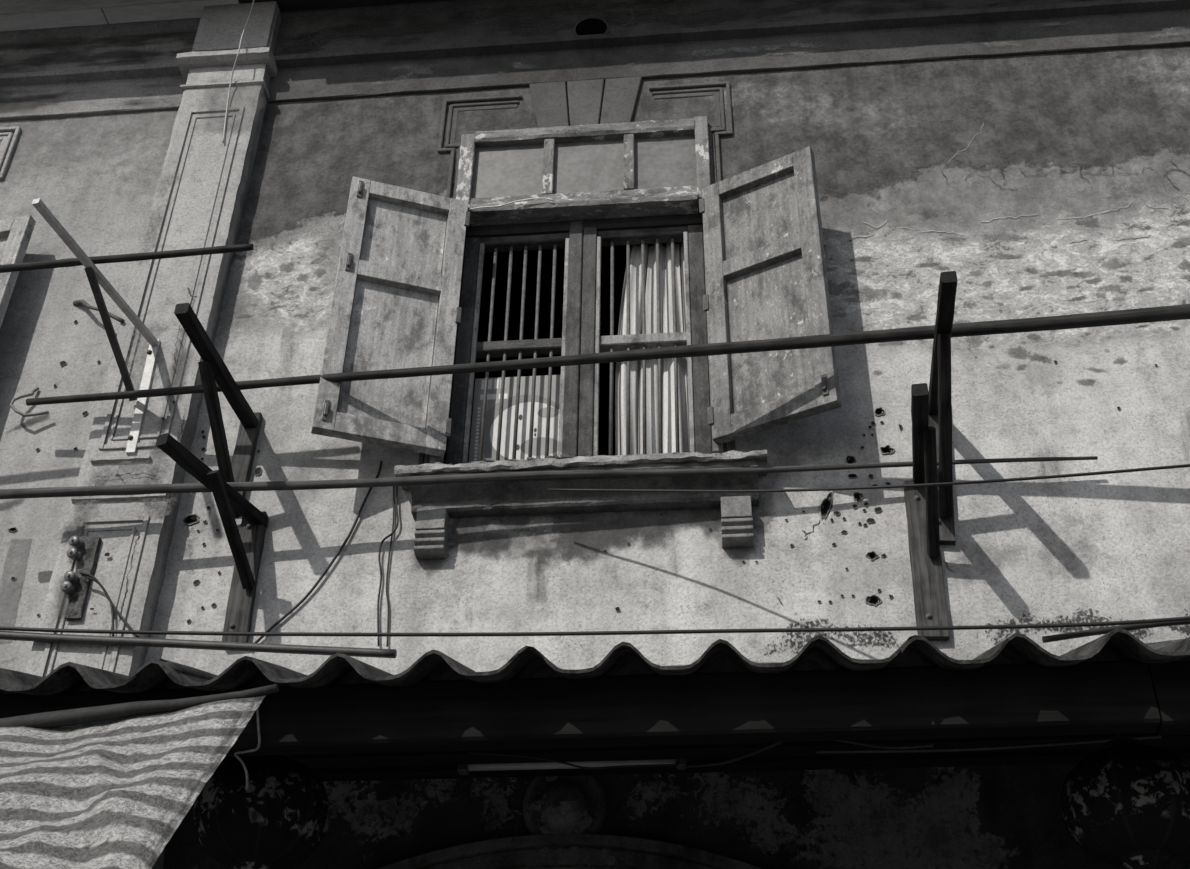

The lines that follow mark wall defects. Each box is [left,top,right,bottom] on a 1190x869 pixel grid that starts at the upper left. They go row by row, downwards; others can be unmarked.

crack [942,160,1190,190]
peeling [236,217,342,333]
peeling [823,186,1190,385]
damp [418,507,721,570]
damp [729,547,751,559]
damp [751,498,767,530]
peeling [626,771,826,858]